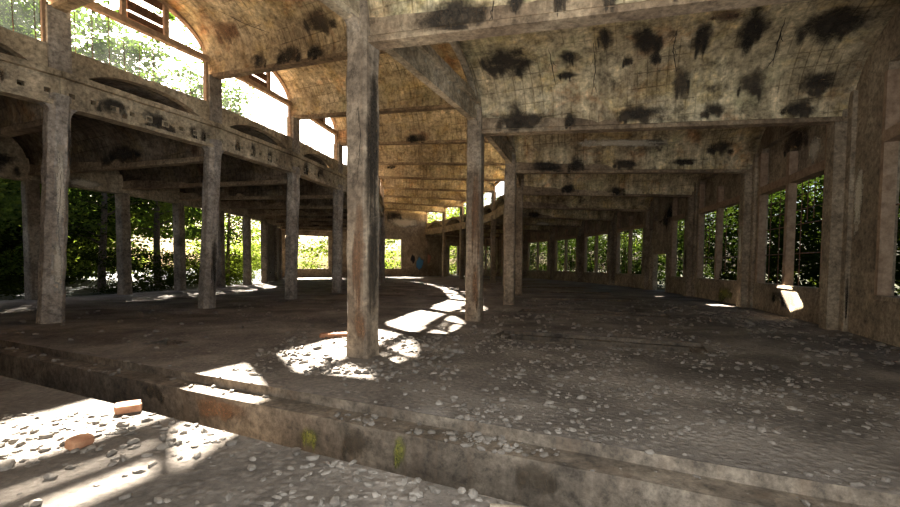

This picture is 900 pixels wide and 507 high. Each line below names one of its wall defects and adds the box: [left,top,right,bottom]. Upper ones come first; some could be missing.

damp [304,8,336,35]
damp [481,59,503,79]
damp [674,71,690,99]
damp [737,71,764,101]